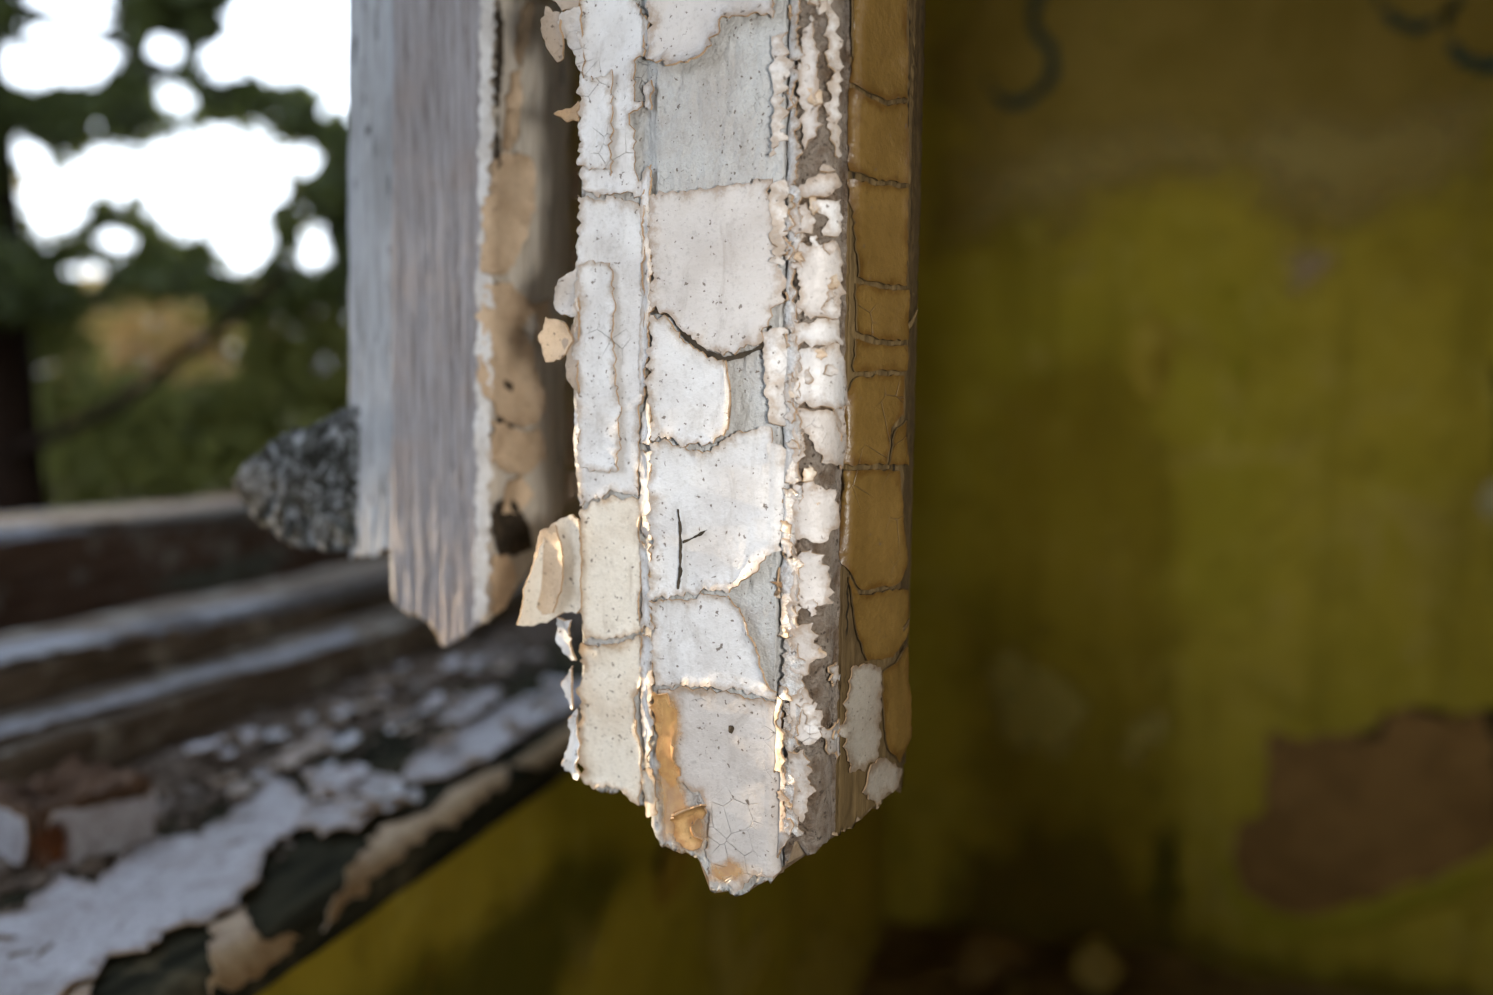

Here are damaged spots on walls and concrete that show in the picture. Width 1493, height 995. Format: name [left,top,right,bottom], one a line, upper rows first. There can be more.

peeling [0,0,912,995]